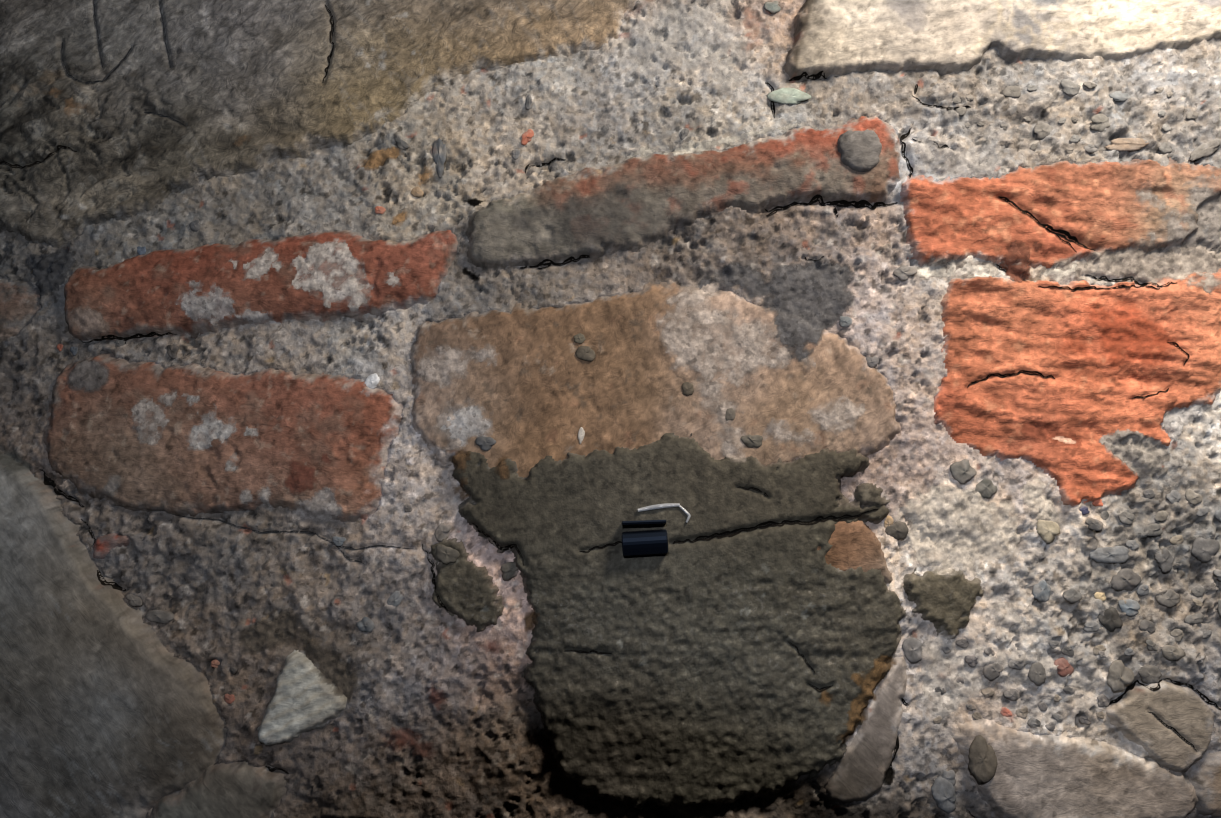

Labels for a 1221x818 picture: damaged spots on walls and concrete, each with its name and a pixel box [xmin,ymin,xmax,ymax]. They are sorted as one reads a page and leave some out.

crack [323,5,334,82]
crack [765,84,970,217]
crack [520,255,590,269]
crack [996,196,1177,291]
crack [580,541,622,553]
crack [673,486,878,544]